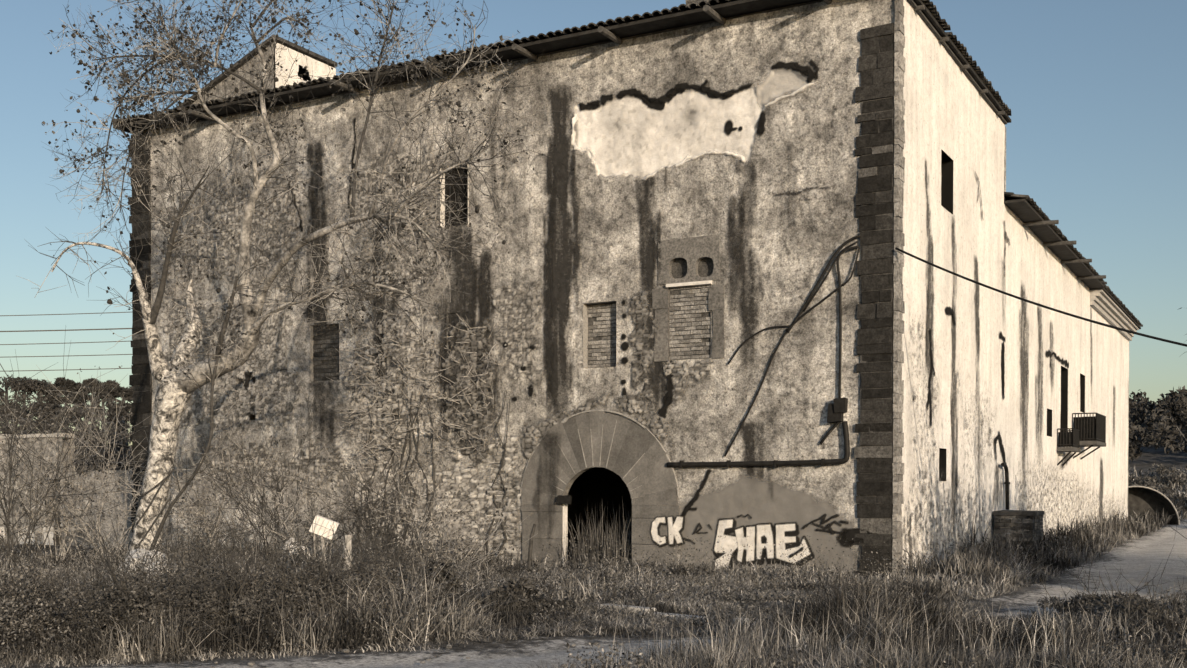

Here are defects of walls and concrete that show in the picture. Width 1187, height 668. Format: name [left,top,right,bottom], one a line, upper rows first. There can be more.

leakage [306,143,330,335]
flaking render [159,144,711,565]
leakage [543,87,581,412]
leakage [635,167,667,409]
flaking render [571,69,814,179]
leakage [729,163,762,362]
leakage [925,162,934,399]
leakage [950,218,958,523]
leakage [1020,286,1054,482]